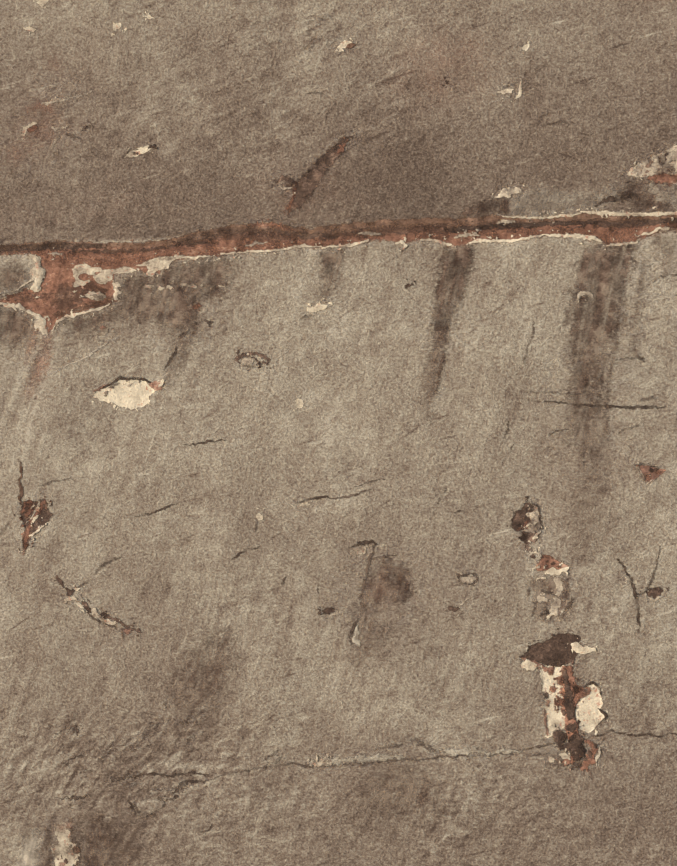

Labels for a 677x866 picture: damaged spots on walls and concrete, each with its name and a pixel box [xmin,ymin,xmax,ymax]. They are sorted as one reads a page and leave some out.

peeling [0,228,381,335]
rust [0,213,677,267]
leakage [425,243,476,410]
peeling [421,144,677,250]
leakage [566,244,636,418]
spalling [90,376,164,411]
spalling [14,462,53,554]
spalling [507,496,608,775]
crack [617,549,660,630]
crack [595,729,677,738]
peeling [48,822,80,866]